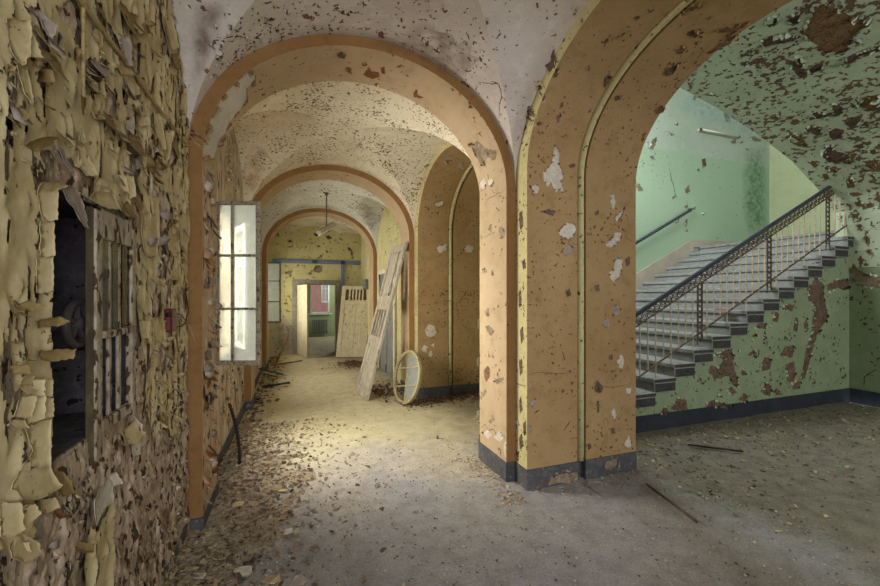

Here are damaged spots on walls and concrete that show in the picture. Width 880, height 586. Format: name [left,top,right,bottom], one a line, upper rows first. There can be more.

peeling [347,62,385,96]
peeling [403,0,494,86]
peeling [544,49,560,78]
peeling [469,140,497,166]
peeling [525,105,542,126]
peeling [532,144,575,194]
peeling [692,0,880,258]
peeling [558,222,587,256]
peeling [606,194,630,283]
peeling [0,1,256,586]
peeling [421,324,438,358]
peeling [660,264,880,416]